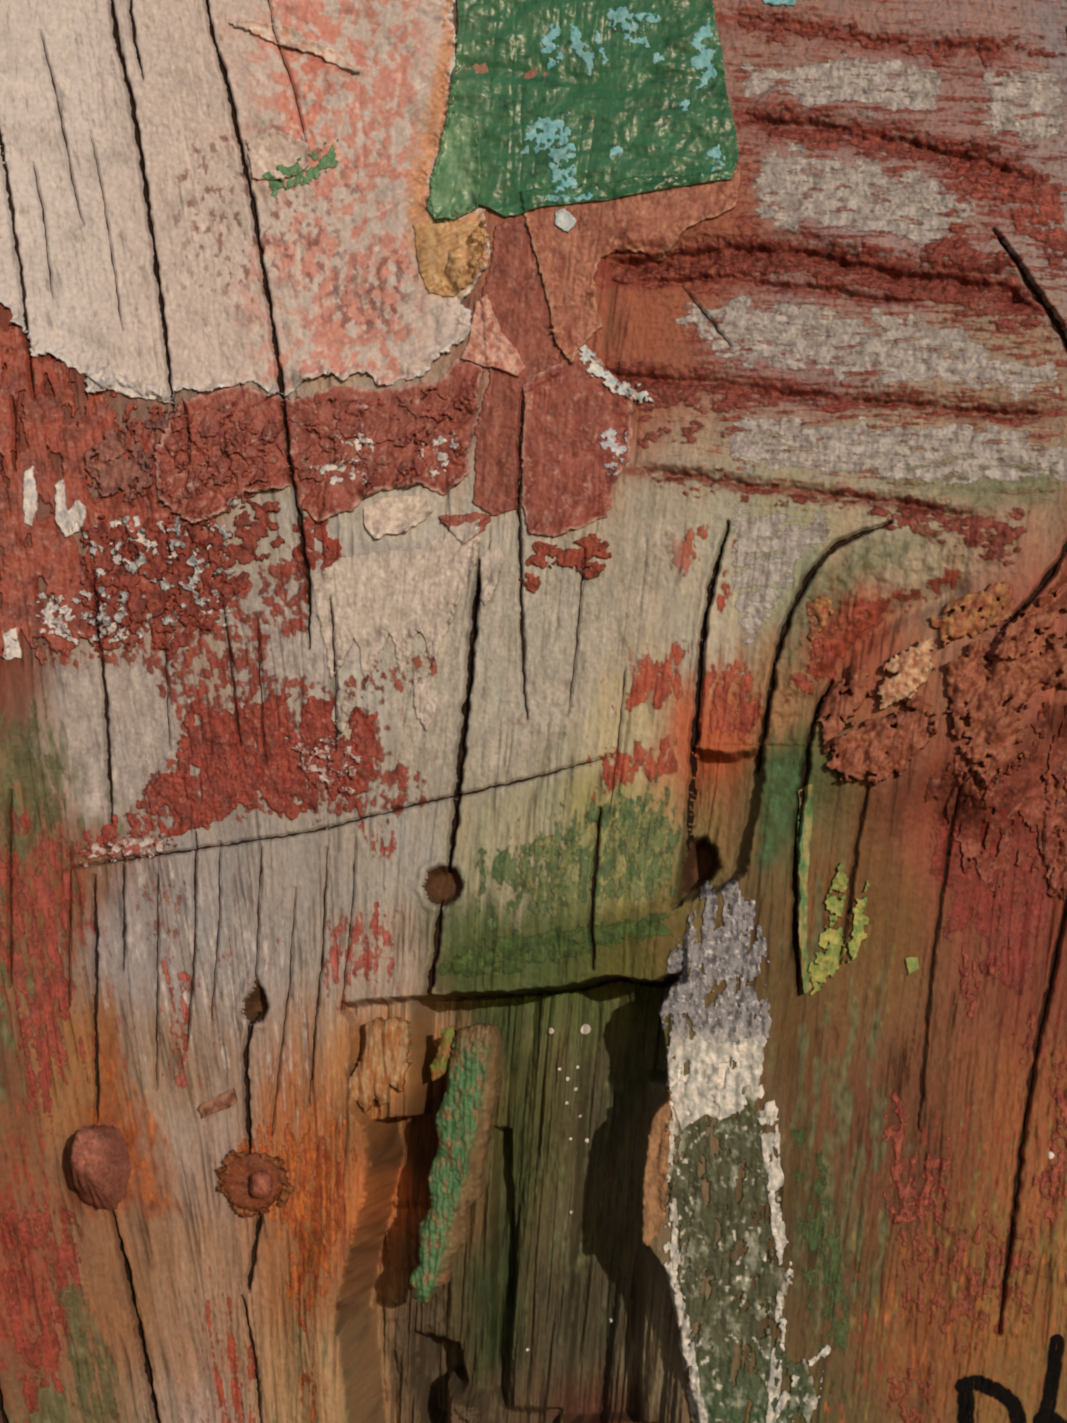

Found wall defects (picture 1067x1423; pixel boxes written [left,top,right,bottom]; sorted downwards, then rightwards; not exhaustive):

peeling [0,0,742,667]
crack [993,232,1067,352]
crack [517,394,528,719]
crack [1001,541,1067,630]
peeling [79,688,379,867]
crack [68,556,625,1154]
peeling [796,784,870,995]
crack [113,1210,161,1423]
crack [243,1216,262,1423]
corrosion [237,1110,357,1346]
peeling [641,880,831,1423]
crack [998,895,1067,1333]